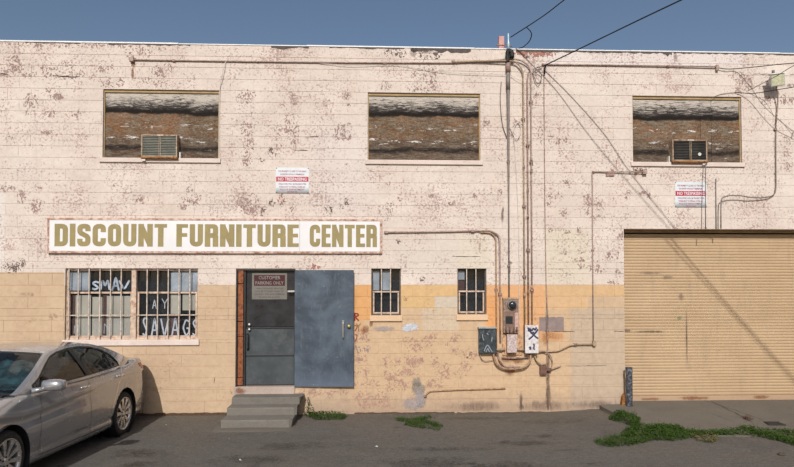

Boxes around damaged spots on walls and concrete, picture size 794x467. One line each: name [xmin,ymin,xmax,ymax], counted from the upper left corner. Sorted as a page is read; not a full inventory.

peeling [0,42,166,118]
peeling [143,63,174,87]
peeling [384,49,441,92]
peeling [728,71,753,95]
peeling [236,89,300,168]
peeling [1,185,45,214]
peeling [176,186,201,210]
peeling [237,191,294,216]
peeling [560,249,621,285]
peeling [298,329,541,414]